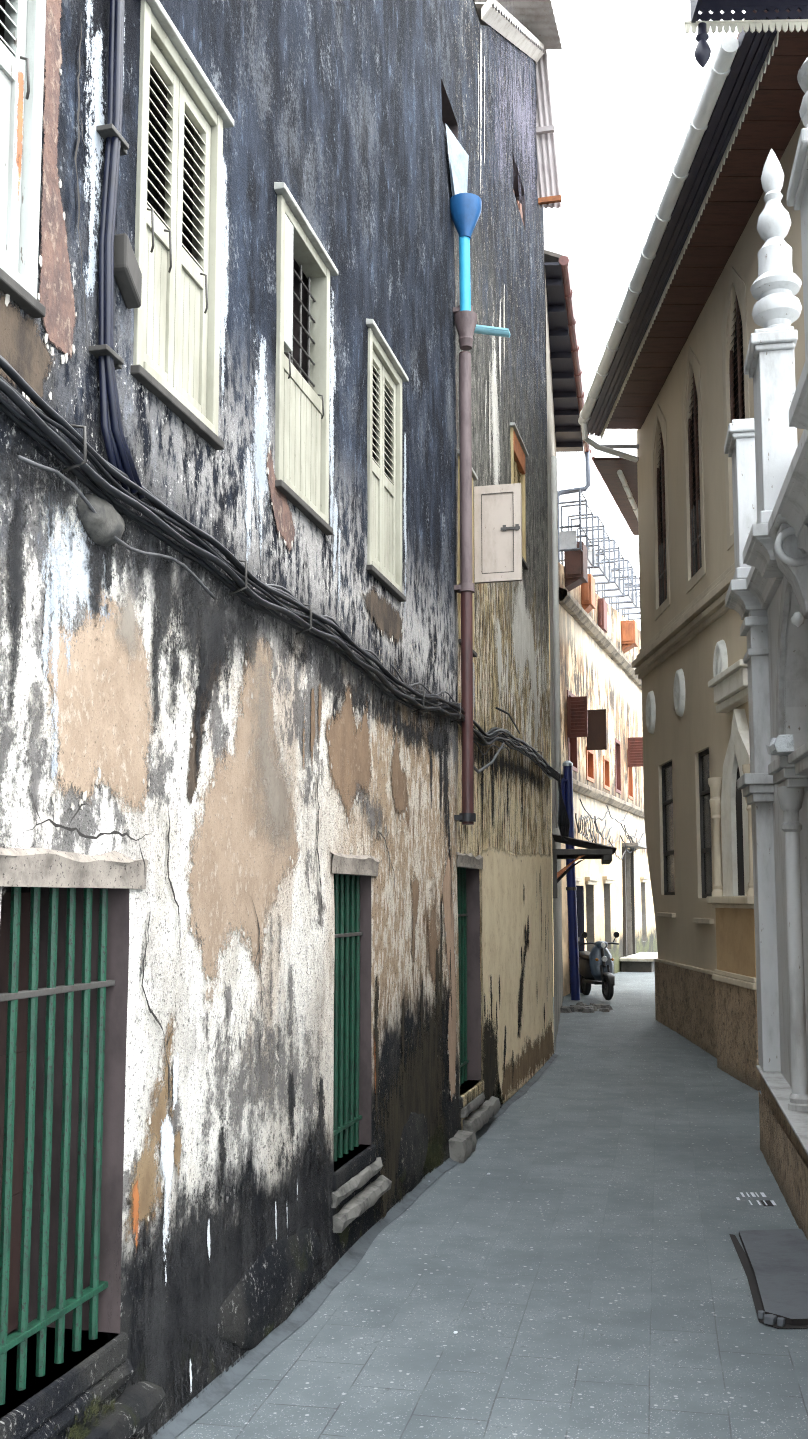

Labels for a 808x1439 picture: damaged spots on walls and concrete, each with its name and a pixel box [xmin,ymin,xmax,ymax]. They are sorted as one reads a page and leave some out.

flaking render [0,0,77,409]
flaking render [41,584,155,814]
crack [26,800,182,1095]
flaking render [185,634,373,1004]
damp [269,918,295,1052]
flaking render [390,721,407,820]
damp [373,899,452,1222]
damp [119,1006,333,1439]